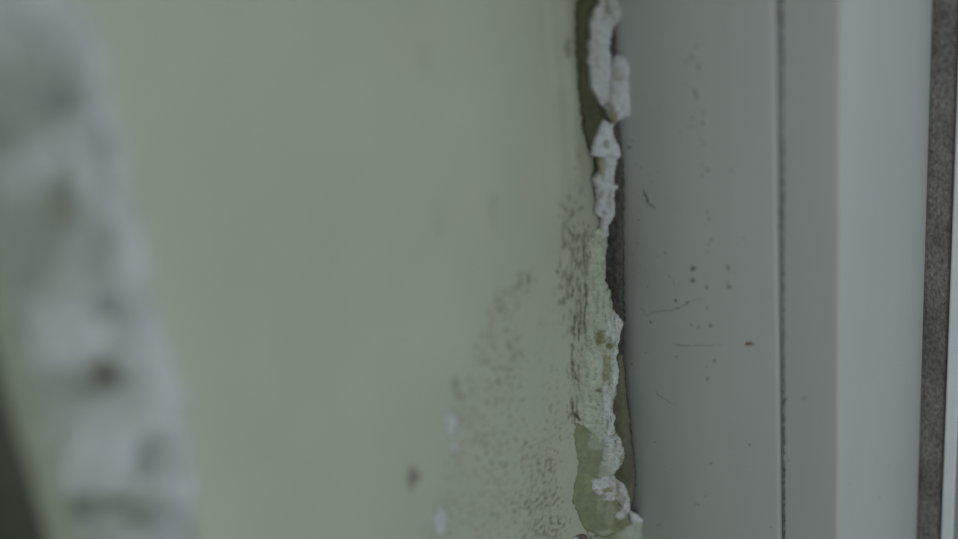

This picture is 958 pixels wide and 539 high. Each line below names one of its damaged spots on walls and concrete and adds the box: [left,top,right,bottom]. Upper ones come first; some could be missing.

flaking render [575,0,631,238]
peeling [572,423,643,539]